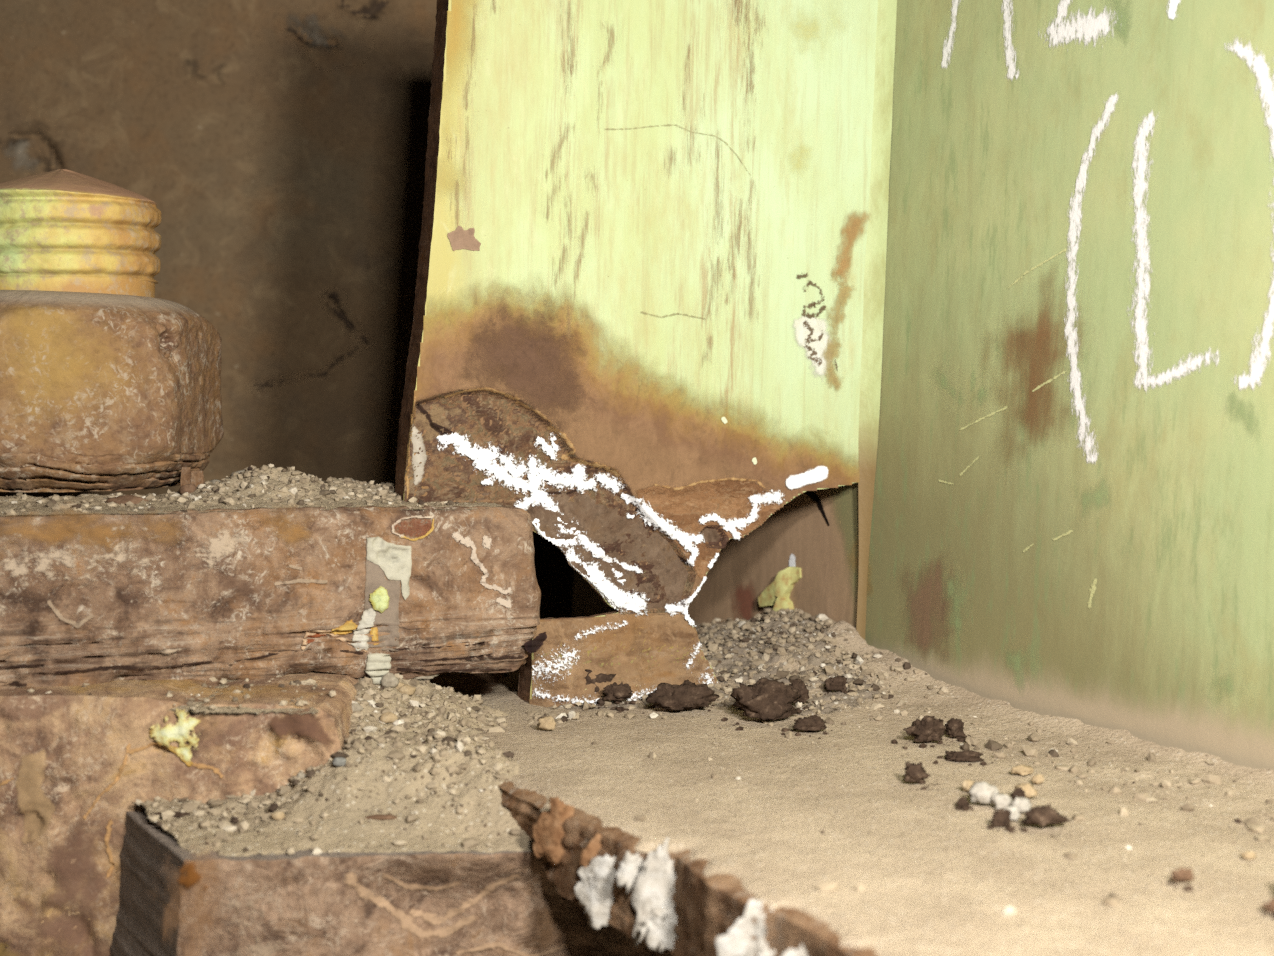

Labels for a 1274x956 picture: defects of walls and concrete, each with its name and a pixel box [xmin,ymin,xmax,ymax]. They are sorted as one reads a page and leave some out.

rust [824,215,866,389]
rust [1008,314,1057,432]
rust [392,515,434,541]
spalling [404,388,696,615]
rust [405,288,870,665]
hole [700,525,729,549]
peeling [758,567,802,616]